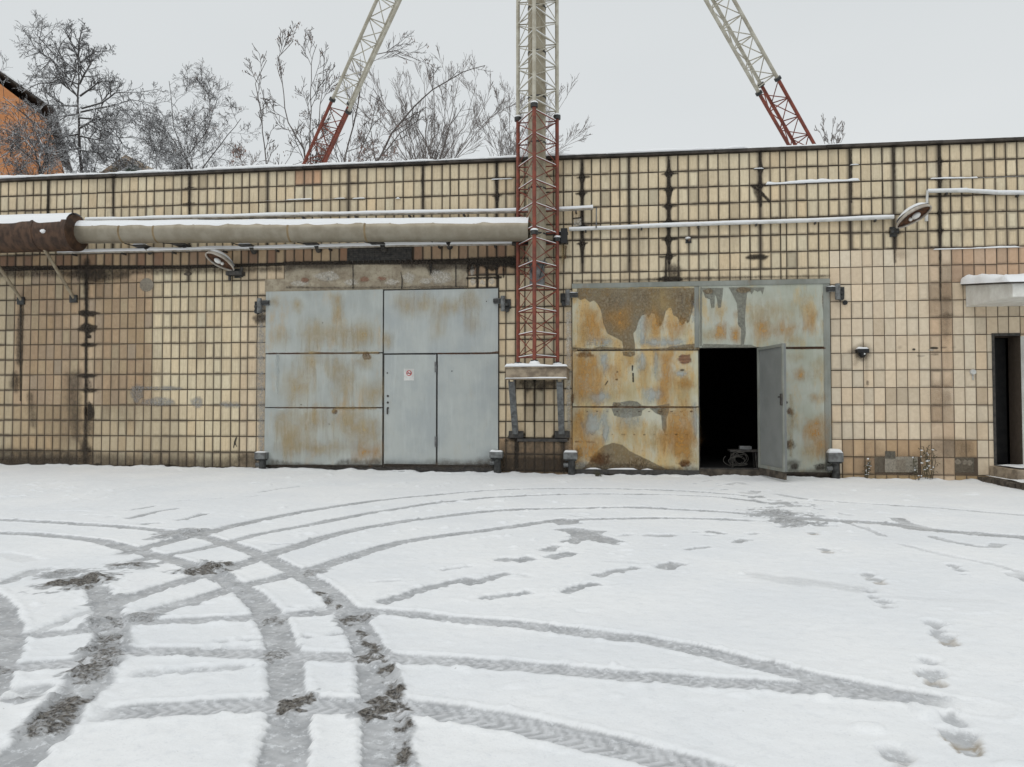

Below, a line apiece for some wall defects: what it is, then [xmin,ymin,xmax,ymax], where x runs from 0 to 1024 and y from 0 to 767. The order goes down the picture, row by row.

water stain [751,151,771,207]
corrosion [269,352,388,373]
water stain [0,160,764,475]
corrosion [571,355,696,467]